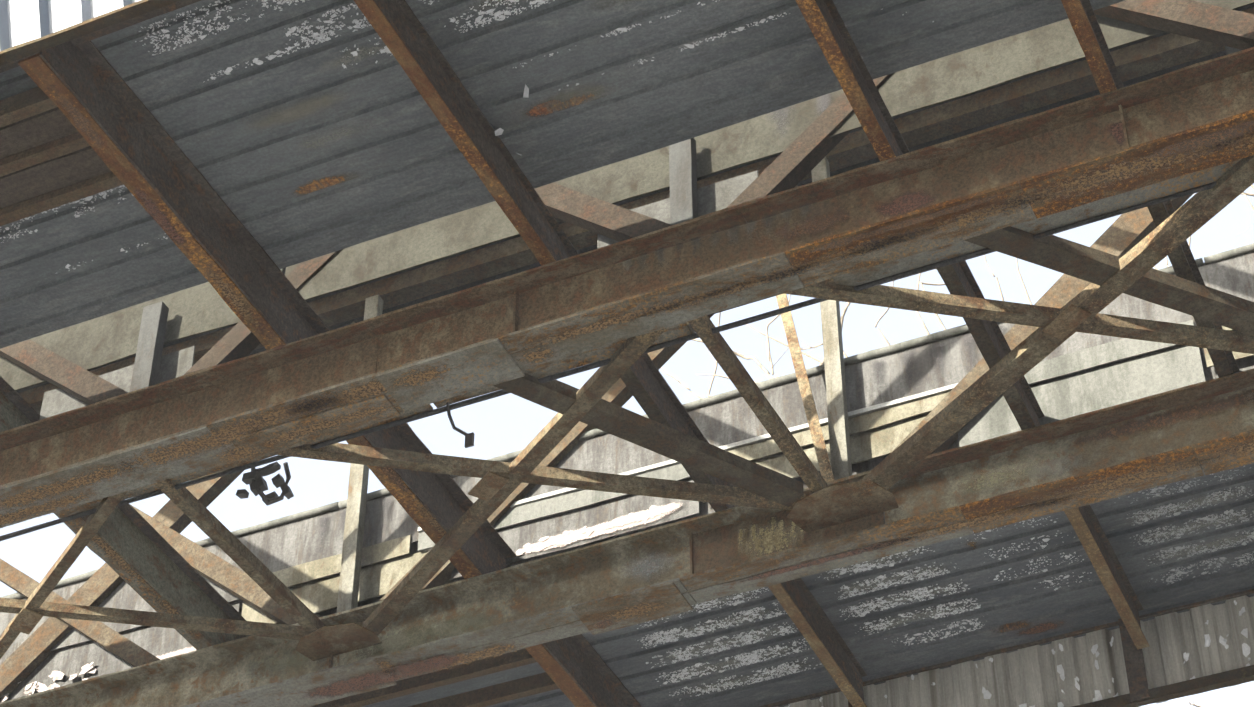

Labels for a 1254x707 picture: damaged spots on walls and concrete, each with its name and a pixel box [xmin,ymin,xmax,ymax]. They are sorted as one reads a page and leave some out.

rust [294,176,351,195]
rust [518,121,1254,367]
rust [740,453,1222,582]